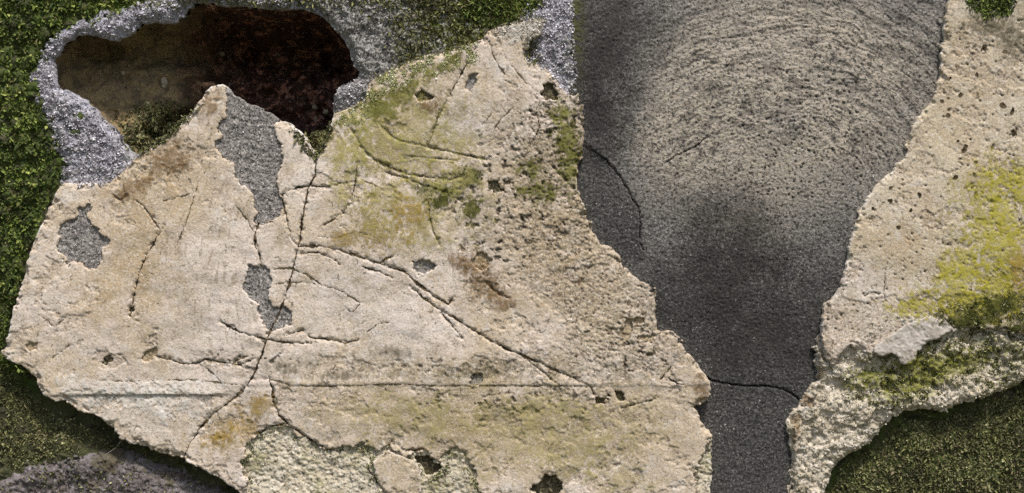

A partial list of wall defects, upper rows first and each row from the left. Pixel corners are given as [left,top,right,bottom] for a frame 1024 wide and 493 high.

spalling [55,4,360,225]
damp [330,98,486,199]
spalling [57,201,110,270]
crack [78,43,594,456]
damp [333,169,474,246]
spalling [243,264,292,334]
damp [939,309,1024,331]
crack [622,366,800,408]
spalling [785,312,1024,493]
spalling [240,423,481,493]
crack [368,441,424,491]